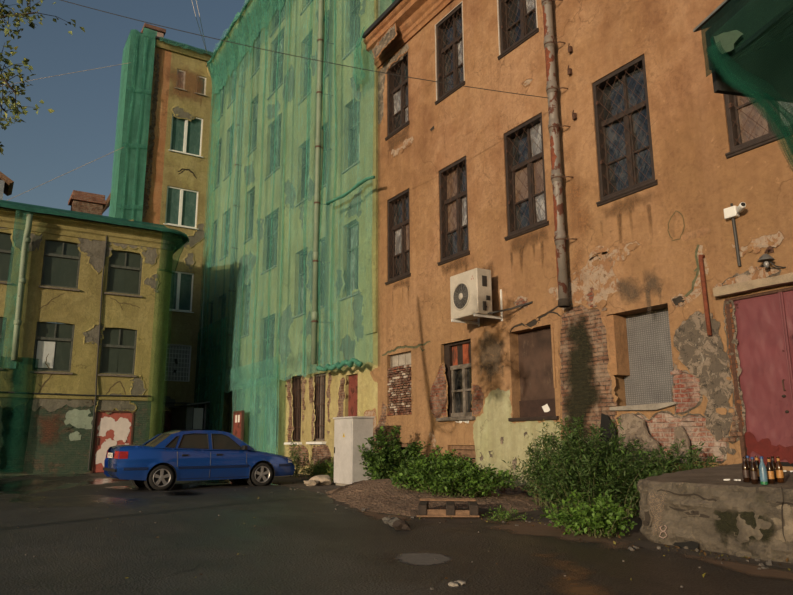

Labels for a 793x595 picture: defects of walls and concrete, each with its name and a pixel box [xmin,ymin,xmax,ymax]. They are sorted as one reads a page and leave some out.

flaking render [372,23,410,126]
flaking render [76,237,161,293]
peeling [732,228,787,257]
peeling [32,375,148,441]
water stain [565,317,598,437]
flaking render [429,251,793,470]